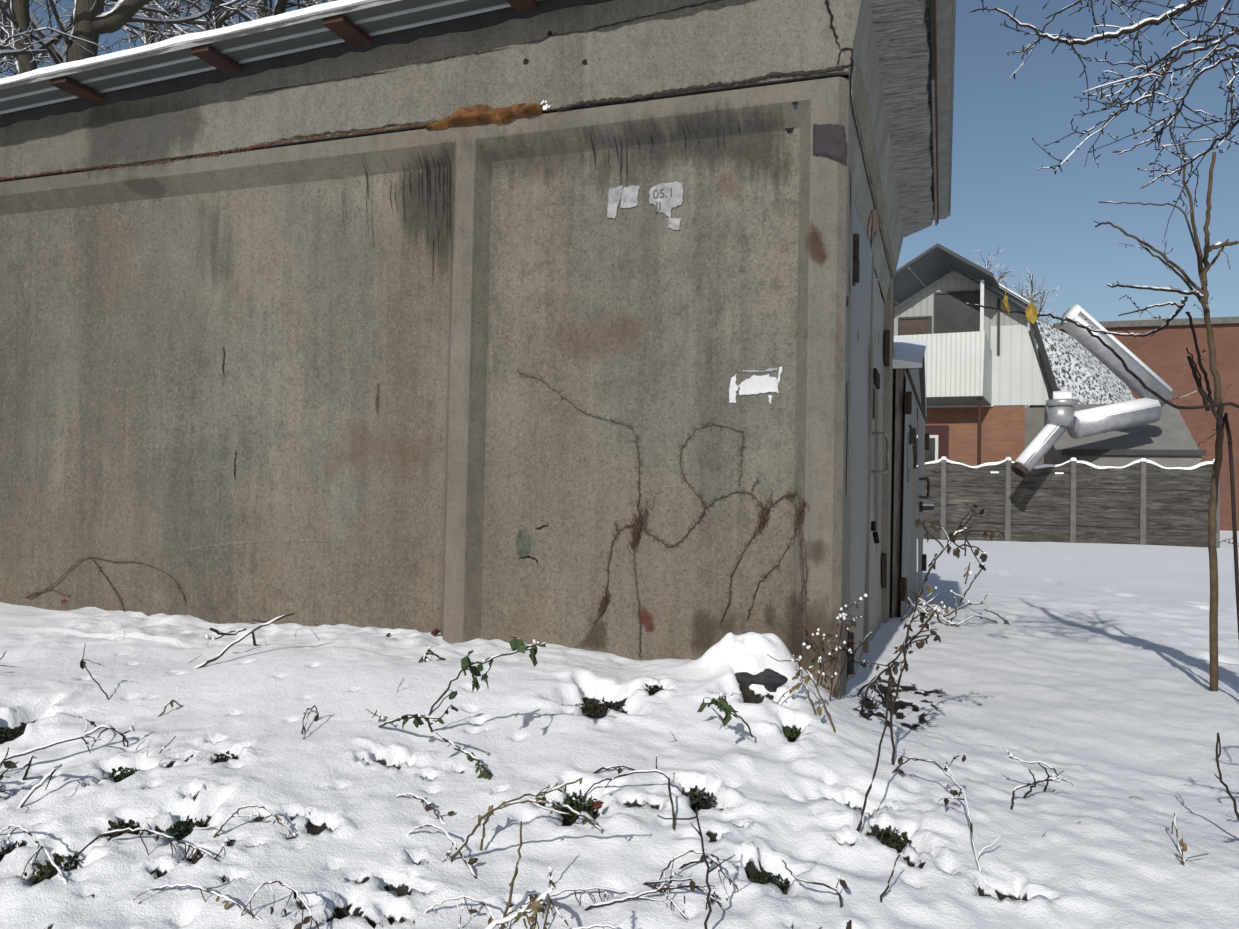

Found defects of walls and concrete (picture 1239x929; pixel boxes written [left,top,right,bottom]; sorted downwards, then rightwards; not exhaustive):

crack [242,0,719,95]
crack [558,0,854,112]
water stain [385,152,451,253]
water stain [589,127,654,177]